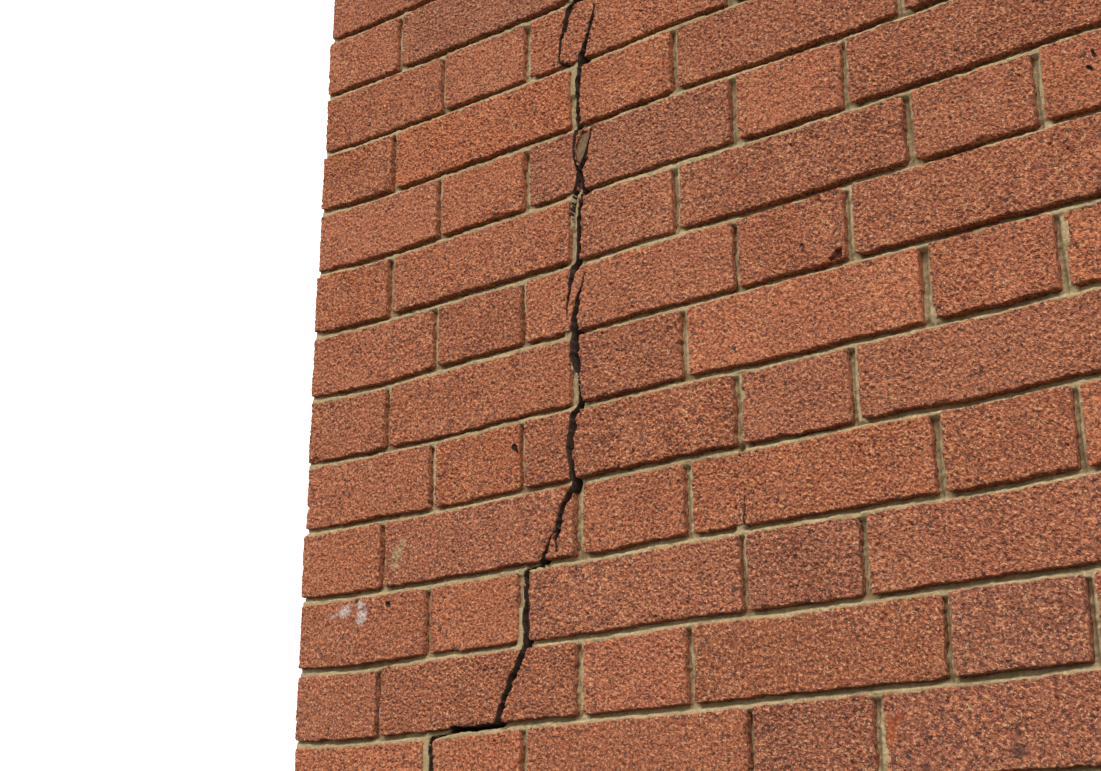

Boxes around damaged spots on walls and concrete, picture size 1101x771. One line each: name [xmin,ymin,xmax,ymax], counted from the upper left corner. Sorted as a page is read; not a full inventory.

crack [428,0,595,771]